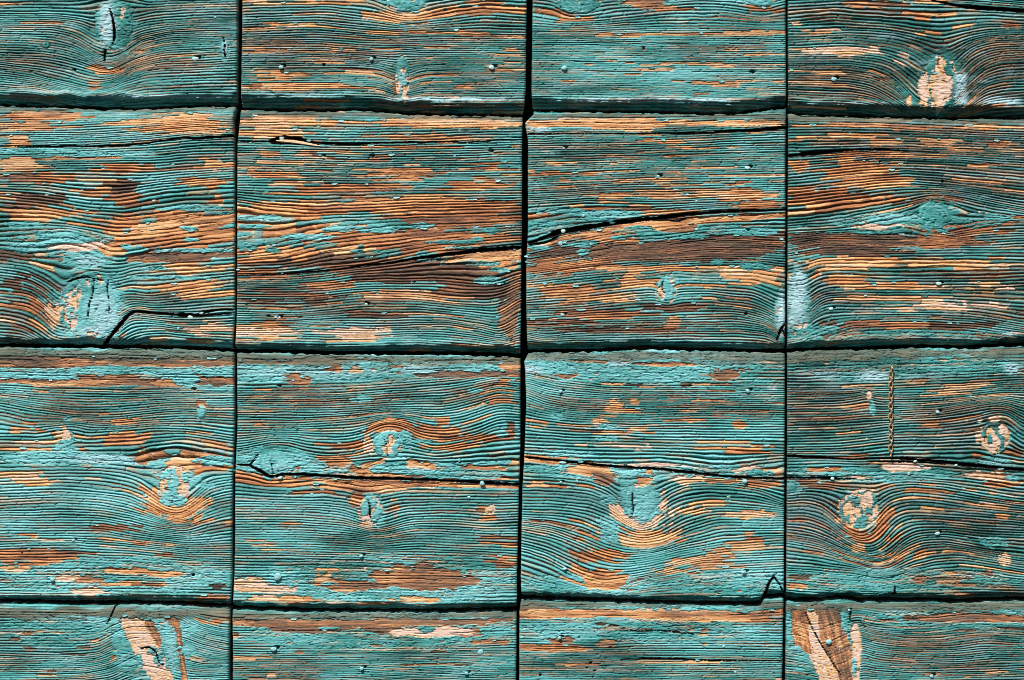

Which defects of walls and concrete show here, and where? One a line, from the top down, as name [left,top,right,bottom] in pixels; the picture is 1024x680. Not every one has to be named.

peeling [0,59,1024,346]
crack [239,208,785,276]
crack [68,276,234,346]
peeling [0,356,311,388]
peeling [0,425,72,452]
peeling [0,471,61,487]
crack [236,440,520,518]
peeling [89,383,783,591]
crack [525,455,1024,517]
peeling [0,533,184,598]
peeling [121,609,188,680]
peeling [194,574,1024,680]